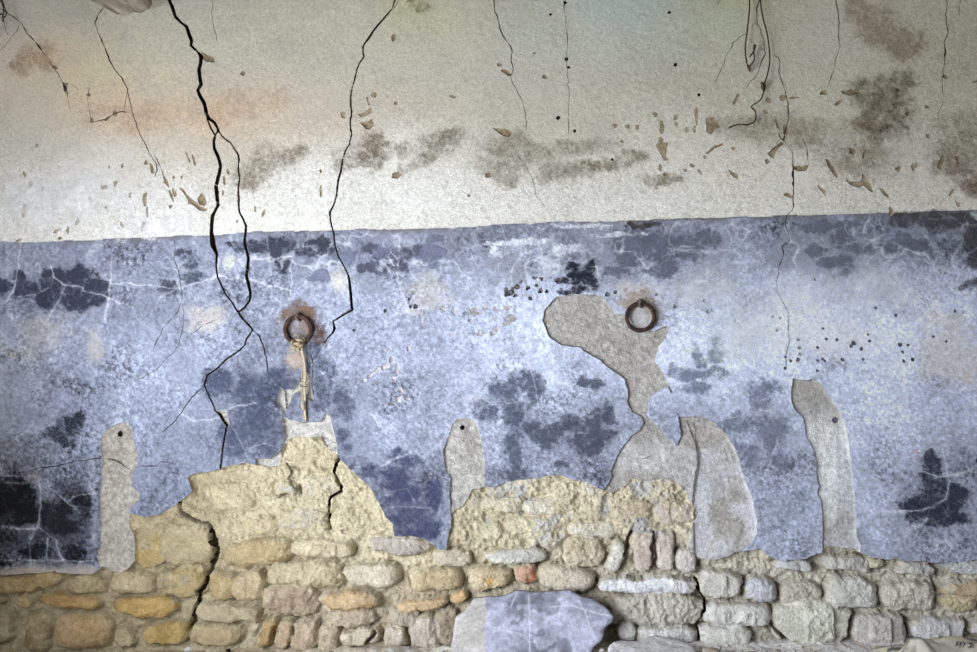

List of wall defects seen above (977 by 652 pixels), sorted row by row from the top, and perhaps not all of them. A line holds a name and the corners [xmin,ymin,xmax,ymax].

crack [138,0,282,469]
crack [308,0,399,412]
damp [0,263,112,313]
corrosion [281,301,326,345]
corrosion [616,290,657,328]
damp [0,471,92,567]
damp [42,410,84,450]
crack [176,501,220,625]
crack [328,459,343,519]
flaking render [0,276,977,652]
damp [477,370,617,481]
damp [896,449,971,527]